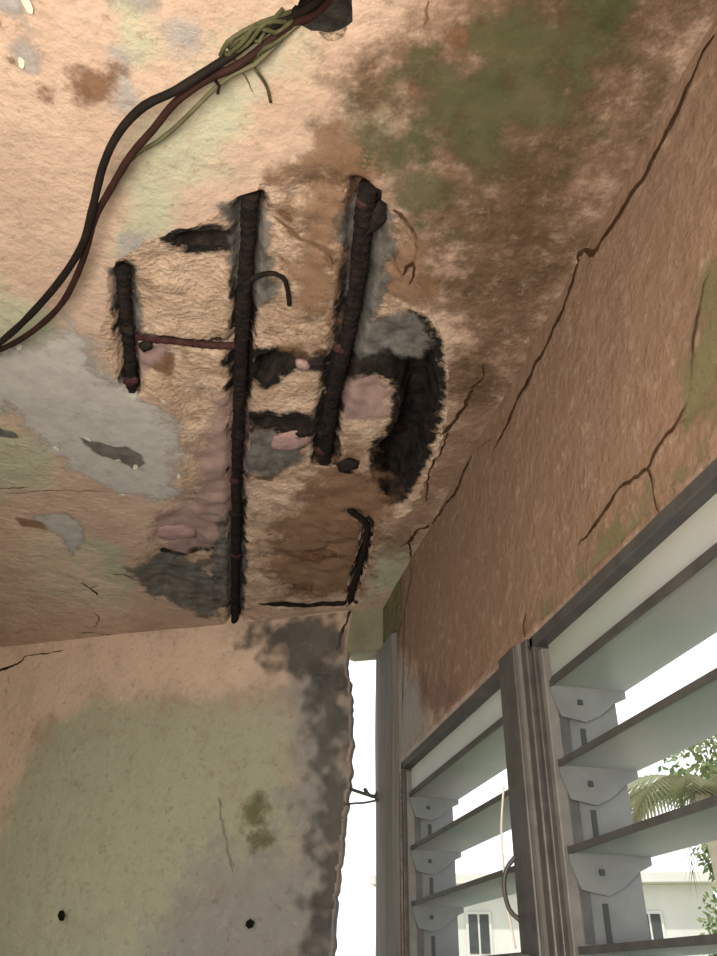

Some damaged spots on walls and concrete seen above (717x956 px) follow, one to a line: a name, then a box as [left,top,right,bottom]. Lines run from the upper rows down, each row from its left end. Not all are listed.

peeling [0,0,33,15]
peeling [10,41,38,72]
spalling [0,164,450,624]
damp [251,197,281,307]
corrosion [341,375,389,419]
damp [353,199,430,360]
crack [391,209,418,285]
crack [401,35,714,636]
corrosion [152,389,266,553]
corrosion [266,451,394,598]
crack [0,650,63,671]
damp [243,616,350,956]